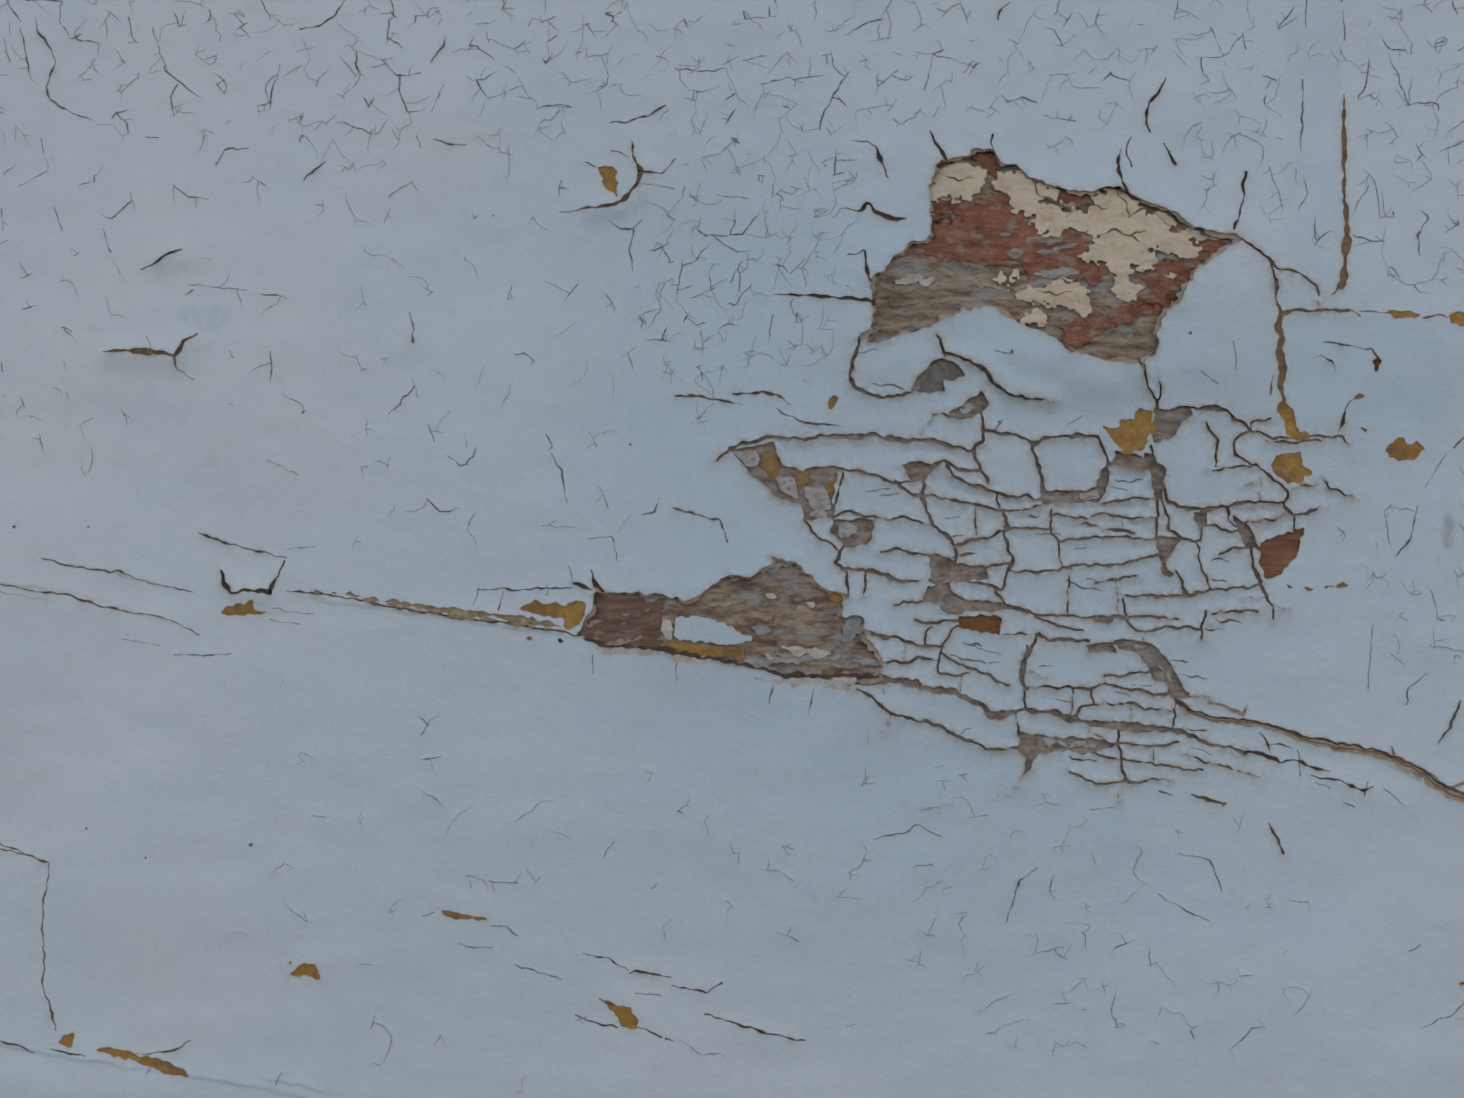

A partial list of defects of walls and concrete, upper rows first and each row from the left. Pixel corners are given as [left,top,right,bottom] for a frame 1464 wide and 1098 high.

crack [0,0,1464,705]
peeling [312,148,1352,785]
crack [419,712,474,842]
crack [1180,695,1464,808]
crack [0,843,86,1057]
crack [273,862,307,925]
crack [678,798,795,881]
crack [136,1040,191,1055]
crack [371,1016,392,1067]